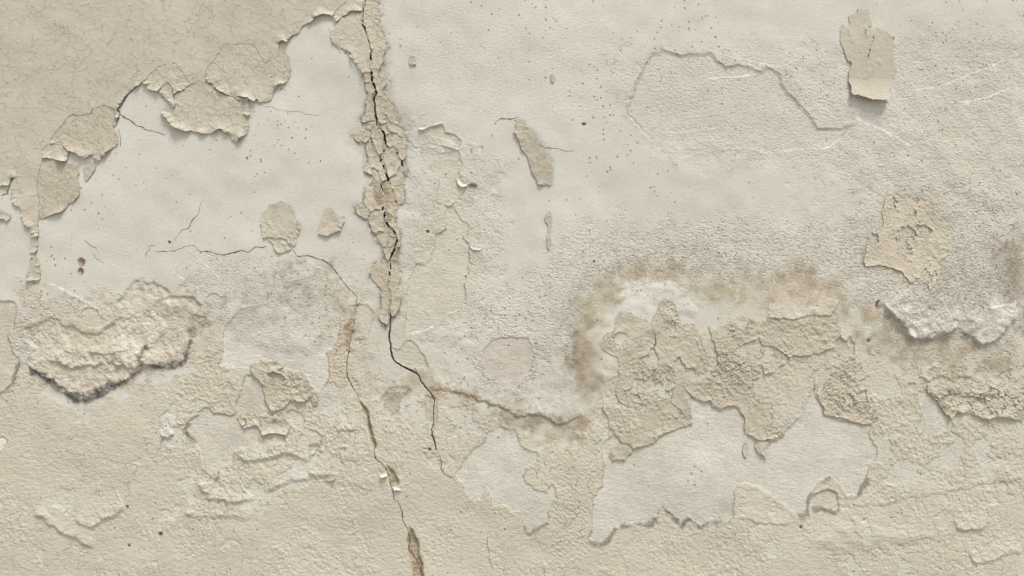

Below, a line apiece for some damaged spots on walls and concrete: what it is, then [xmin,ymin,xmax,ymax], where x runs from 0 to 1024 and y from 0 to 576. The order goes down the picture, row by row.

peeling [840,8,897,100]
peeling [0,0,584,532]
crack [292,249,433,576]
crack [337,0,455,478]
peeling [588,375,877,545]
peeling [918,383,1024,438]